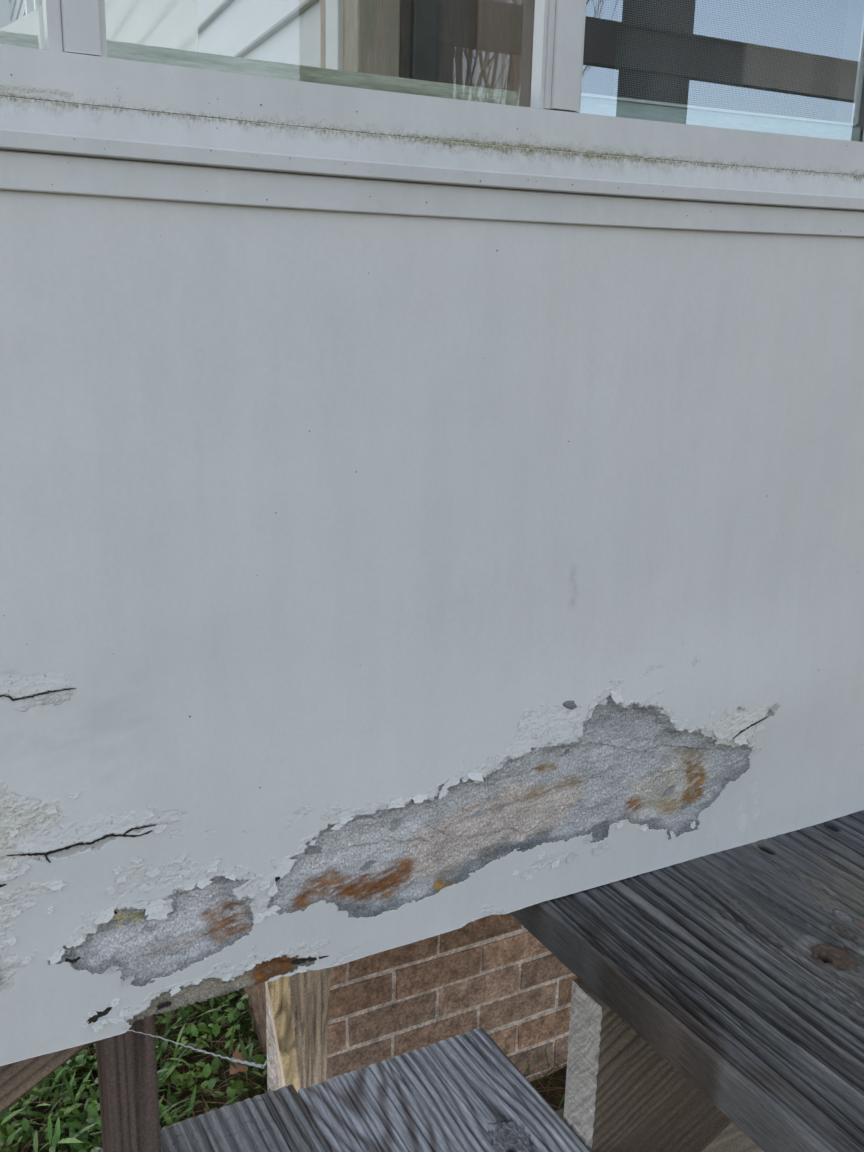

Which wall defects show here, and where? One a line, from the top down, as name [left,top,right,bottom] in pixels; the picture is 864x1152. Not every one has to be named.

corrosion [683,762,706,803]
crack [3,806,196,863]
peeling [0,677,781,1032]
corrosion [297,859,412,906]
corrosion [204,903,245,940]
corrosion [254,957,294,982]